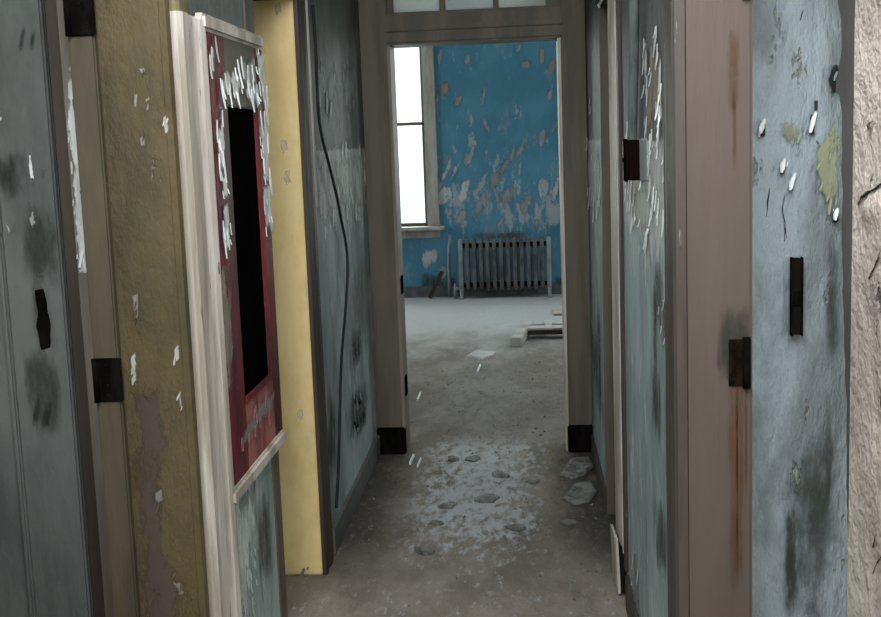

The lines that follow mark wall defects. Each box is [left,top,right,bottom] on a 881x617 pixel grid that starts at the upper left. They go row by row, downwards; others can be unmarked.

peeling [67,67,87,273]
peeling [209,36,273,391]
peeling [439,143,549,229]
peeling [514,44,555,74]
peeling [624,25,664,254]
peeling [780,158,796,191]
peeling [783,98,839,223]
spalling [828,65,839,93]
crack [857,174,881,206]
corrosion [730,389,747,569]
water stain [786,436,831,597]